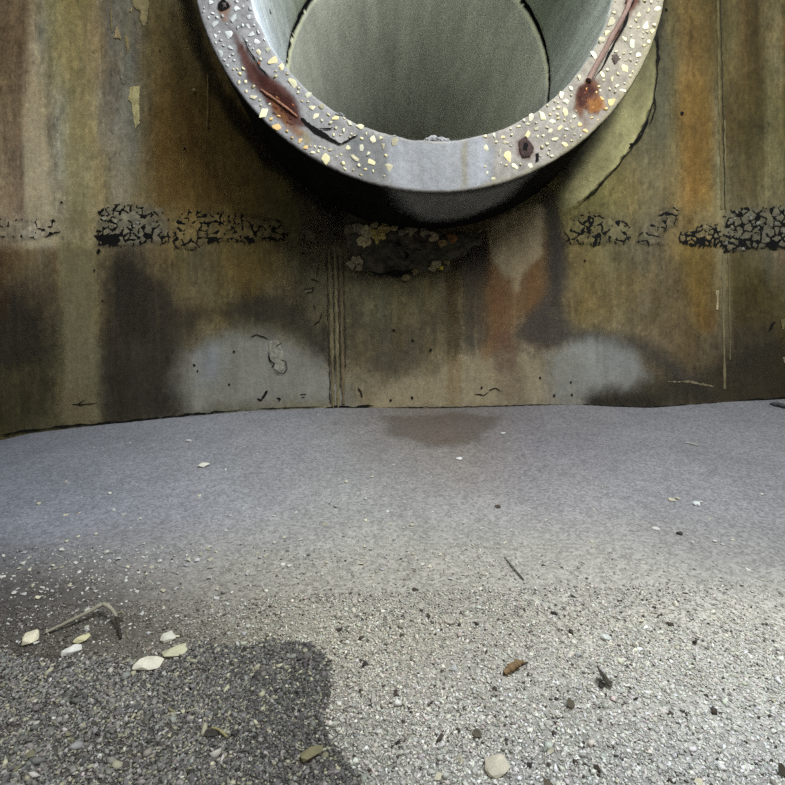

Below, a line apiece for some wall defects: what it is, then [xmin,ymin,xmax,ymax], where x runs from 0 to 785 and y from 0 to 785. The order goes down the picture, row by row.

rust [238,41,303,126]
rust [576,81,602,114]
crack [569,35,660,211]
leakage [183,0,639,399]
spalling [0,215,60,241]
spalling [94,204,288,254]
spalling [563,205,785,253]